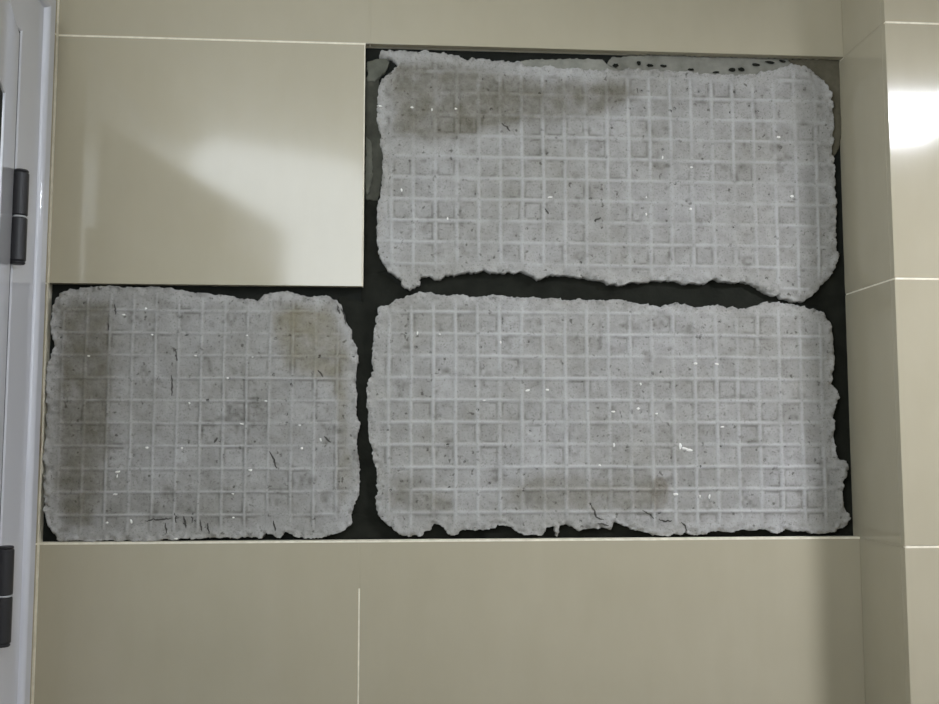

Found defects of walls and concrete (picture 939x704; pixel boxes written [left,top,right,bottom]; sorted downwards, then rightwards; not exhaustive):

spalling [42,49,851,542]